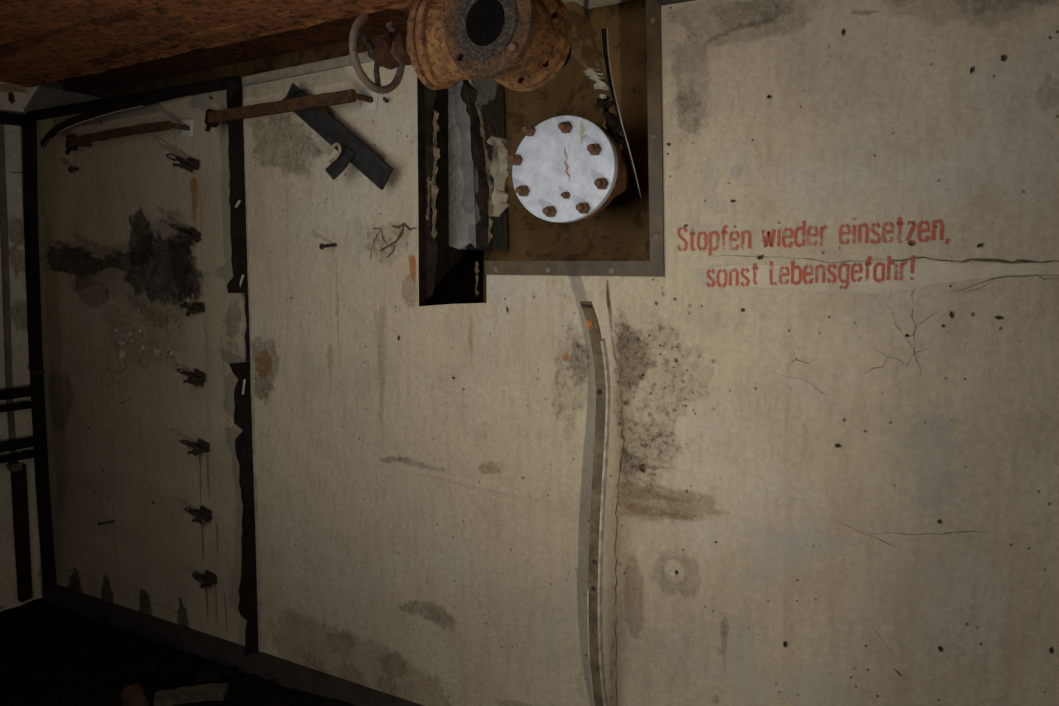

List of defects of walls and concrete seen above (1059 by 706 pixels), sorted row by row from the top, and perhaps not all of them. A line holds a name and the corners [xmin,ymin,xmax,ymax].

damp [47,209,203,325]
crack [716,255,1059,264]
crack [868,287,937,373]
crack [606,280,625,703]